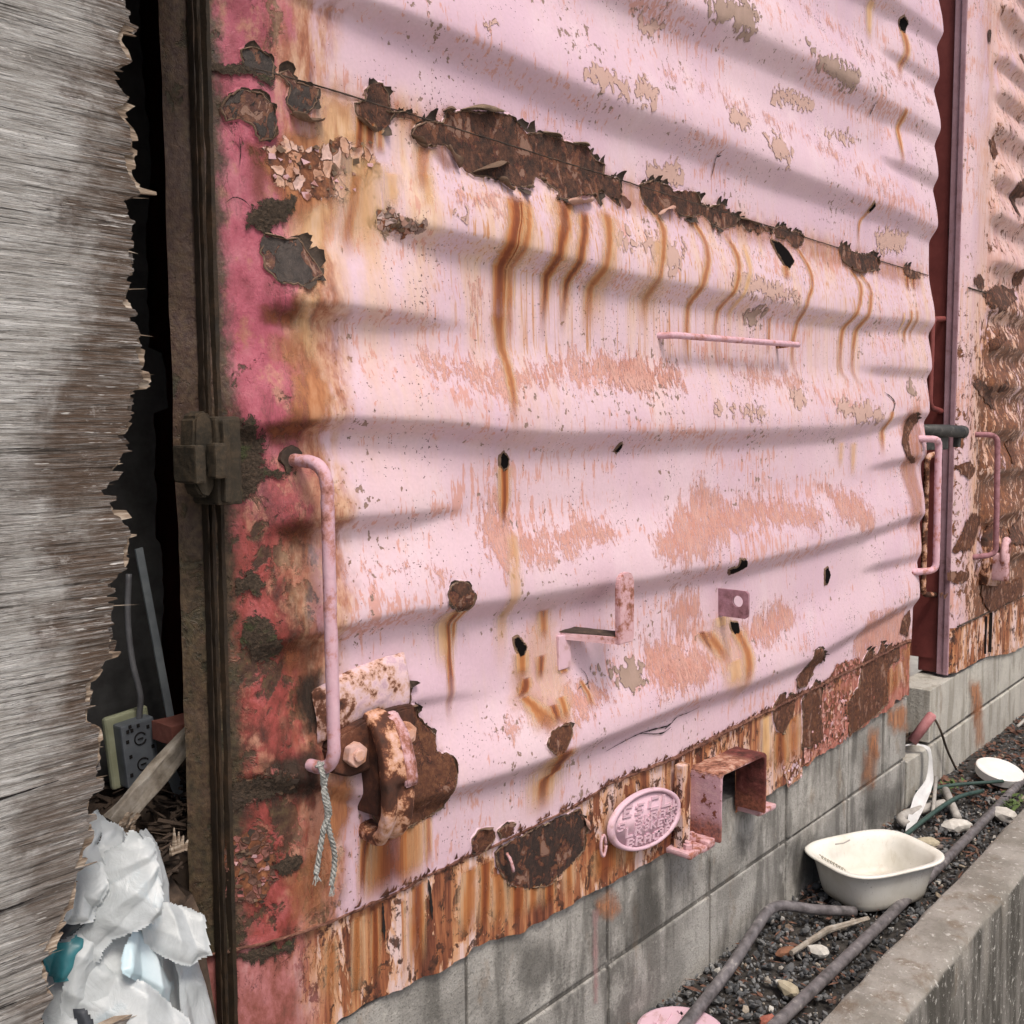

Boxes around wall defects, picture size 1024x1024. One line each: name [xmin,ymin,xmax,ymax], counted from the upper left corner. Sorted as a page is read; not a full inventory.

peeling [806,22,934,105]
peeling [218,40,815,277]
peeling [257,231,326,289]
corrosion [492,198,535,404]
corrosion [541,203,615,307]
corrosion [685,221,712,331]
corrosion [435,611,466,691]
corrosion [516,651,568,723]
peeling [545,470,876,756]
corrosion [269,749,319,799]
corrosion [360,818,432,886]
peeling [469,806,591,890]